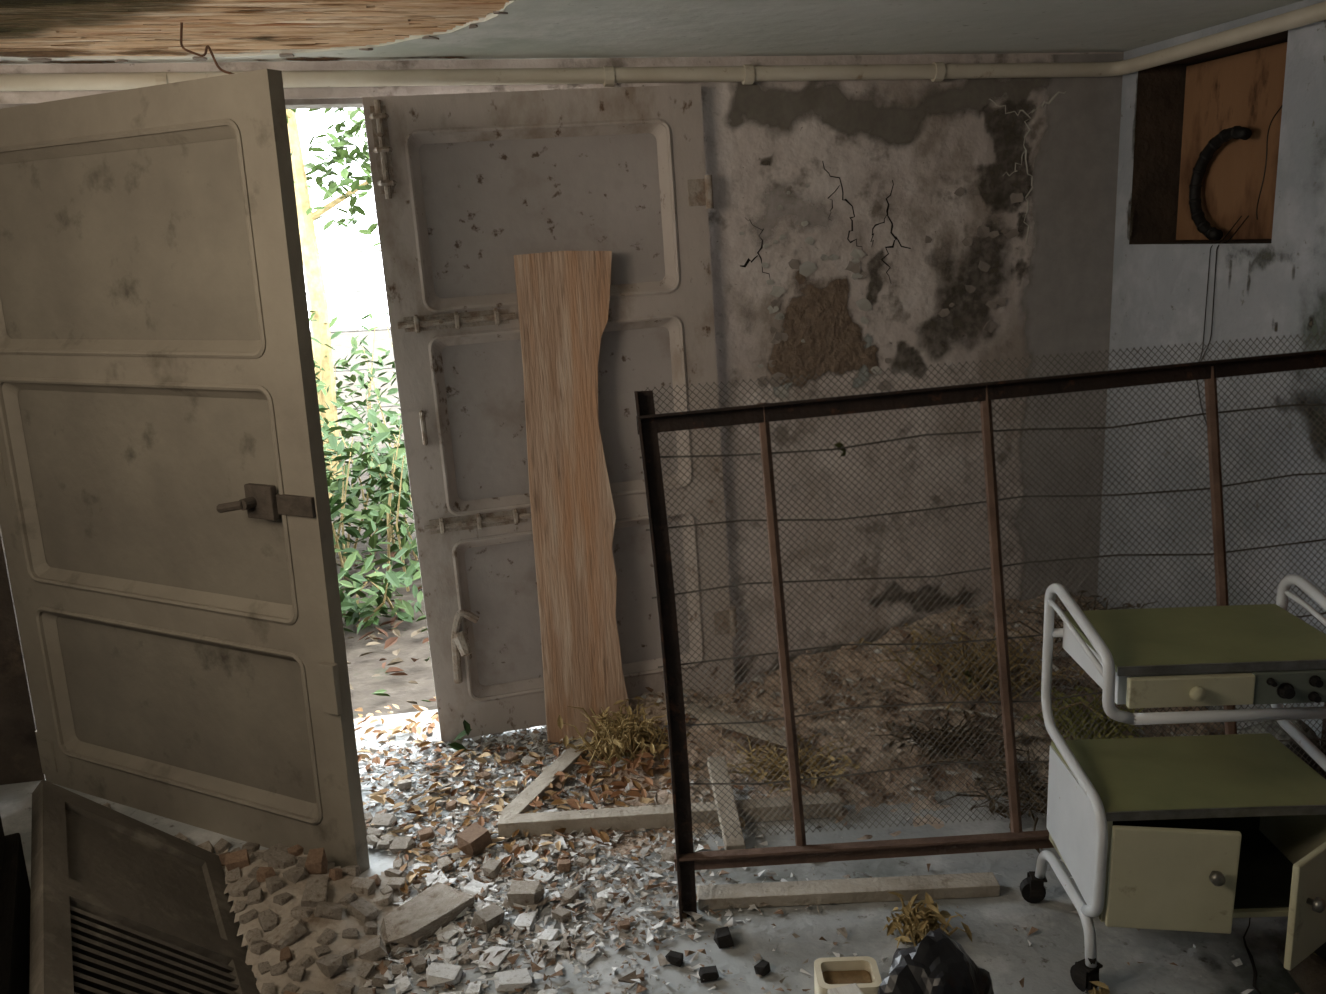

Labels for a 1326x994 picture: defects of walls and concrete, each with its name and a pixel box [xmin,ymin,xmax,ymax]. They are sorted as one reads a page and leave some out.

crack [740,220,770,278]
spalling [757,248,891,399]
crack [822,161,911,283]
leakage [728,78,1050,378]